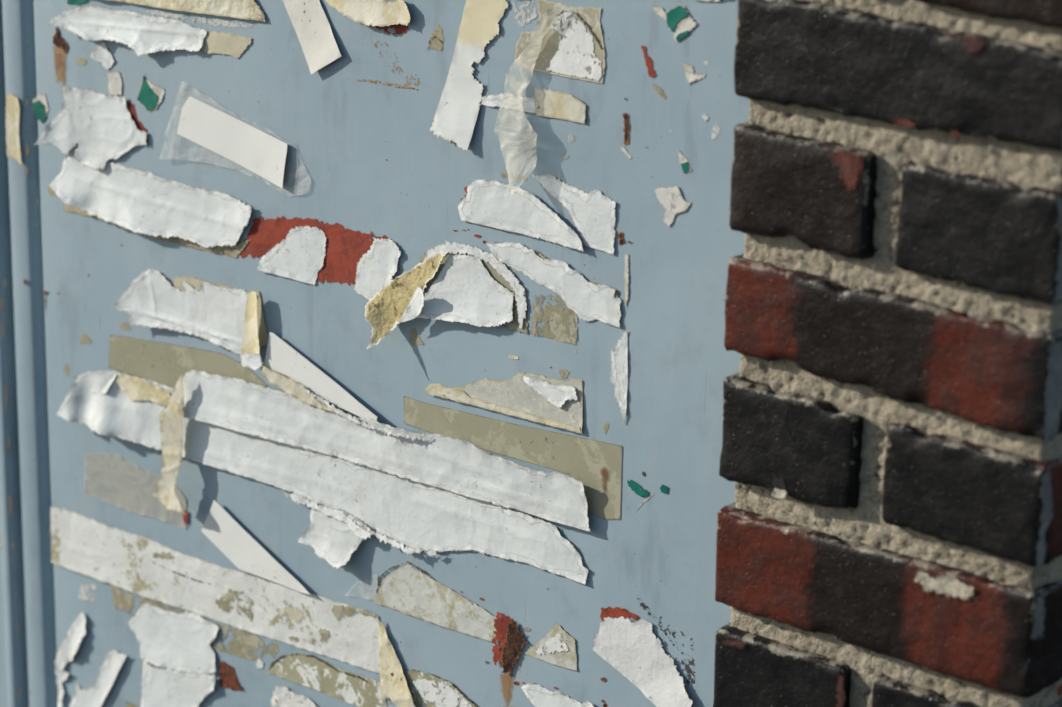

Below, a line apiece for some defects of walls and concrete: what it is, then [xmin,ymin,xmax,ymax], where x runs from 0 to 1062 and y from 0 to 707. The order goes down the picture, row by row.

corrosion [485,612,530,703]
peeling [600,607,640,621]